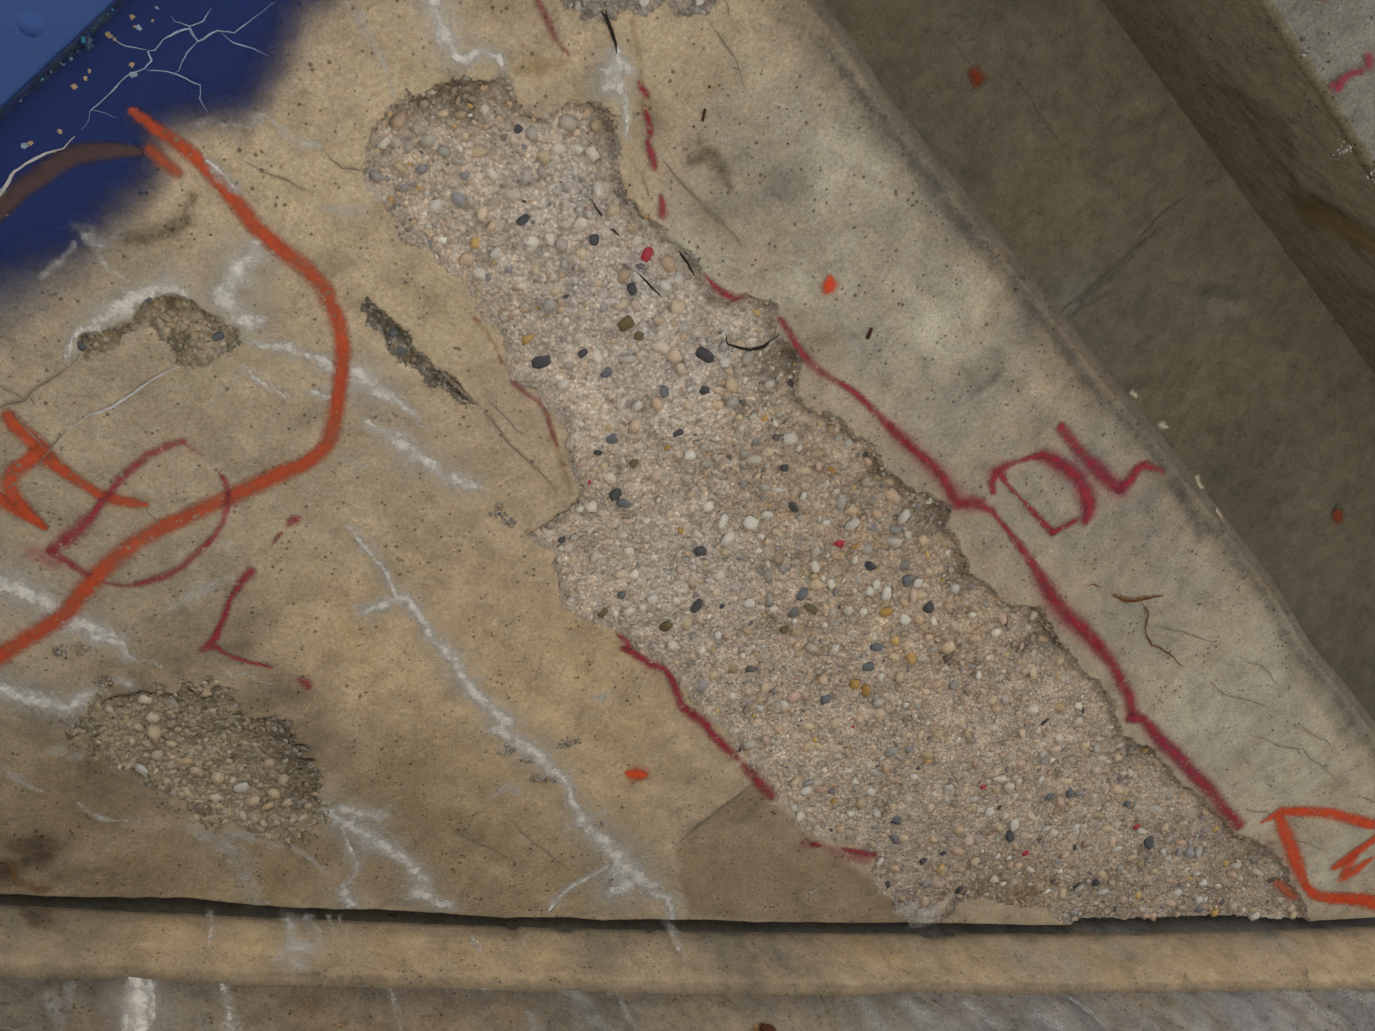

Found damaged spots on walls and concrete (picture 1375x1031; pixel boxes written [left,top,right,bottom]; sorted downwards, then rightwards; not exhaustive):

crack [0,2,274,196]
spalling [560,0,717,25]
spalling [77,293,241,370]
spalling [360,71,1311,924]
spalling [59,671,332,847]
crack [1085,584,1375,803]